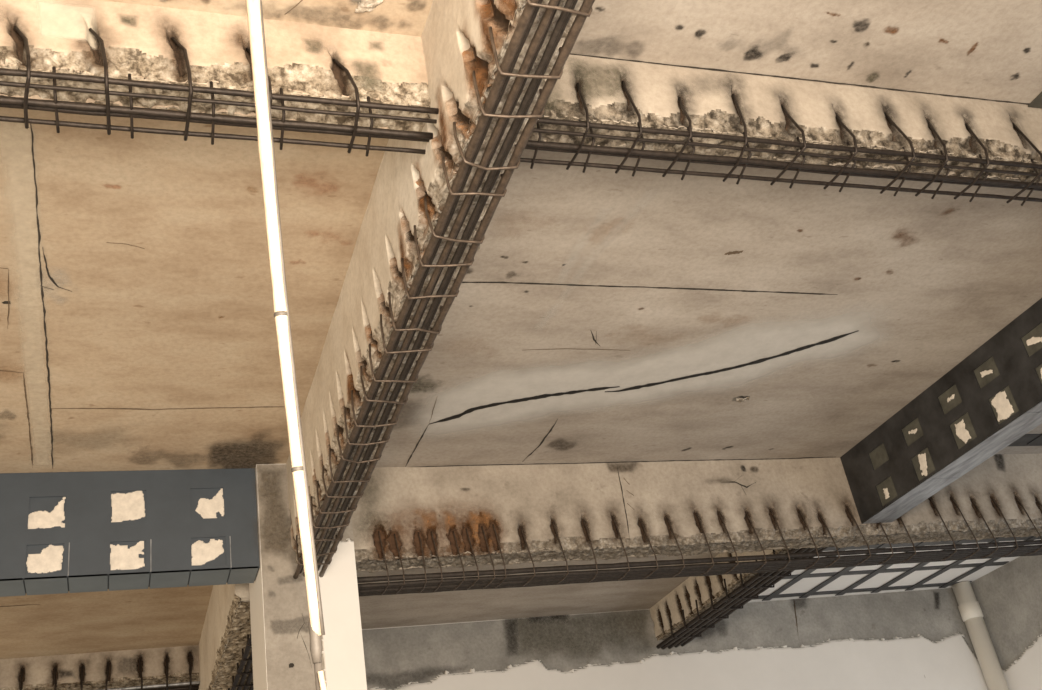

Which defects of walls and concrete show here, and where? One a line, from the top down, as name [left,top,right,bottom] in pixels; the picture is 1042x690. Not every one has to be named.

spalling [0,17,256,118]
crack [0,124,300,468]
crack [405,330,859,533]
peeling [28,497,66,529]
peeling [111,491,145,522]
peeling [195,488,224,519]
peeling [26,545,64,574]
peeling [110,541,145,570]
peeling [191,539,224,566]
flaking render [257,464,327,690]
spalling [0,594,253,690]